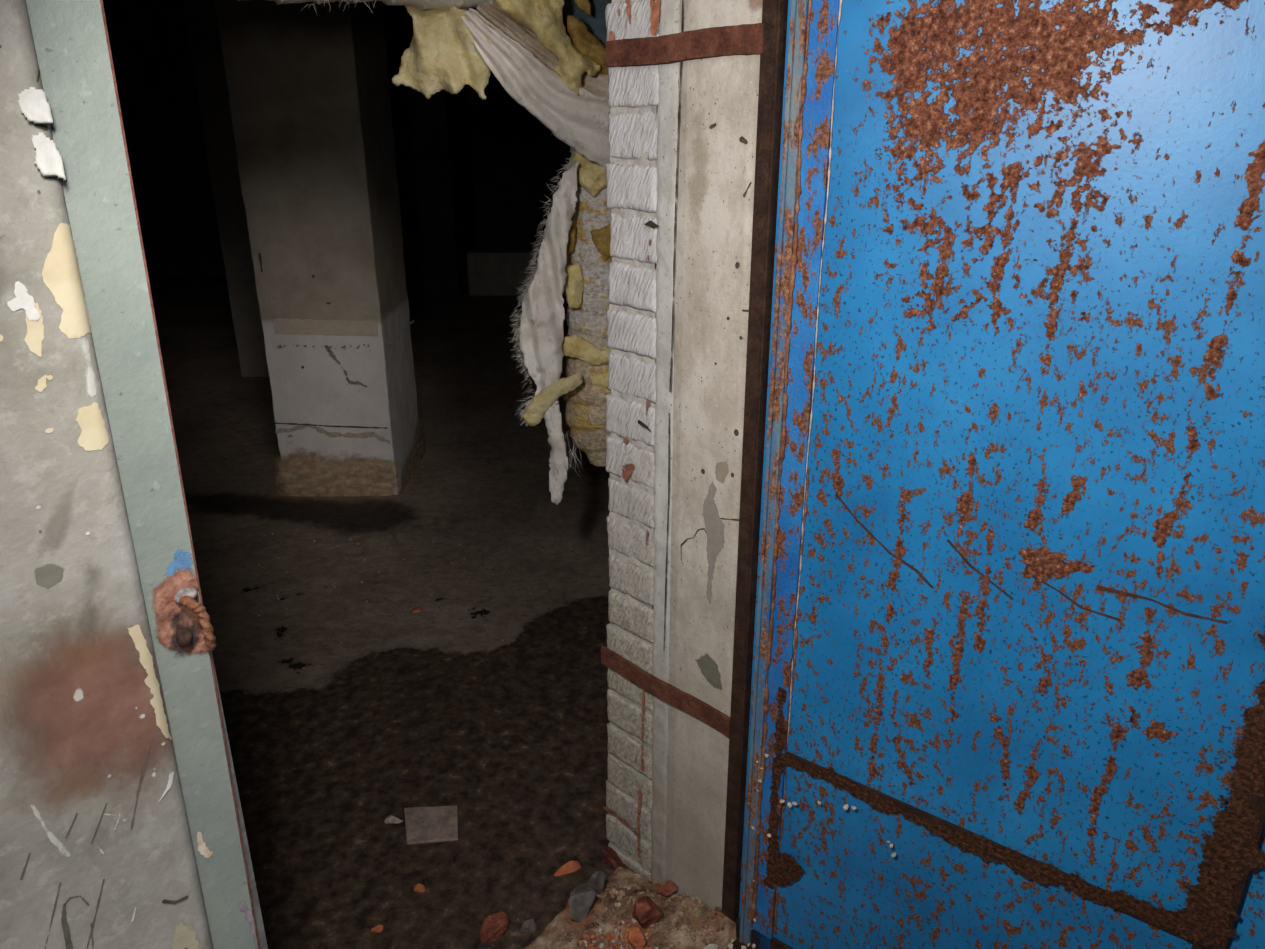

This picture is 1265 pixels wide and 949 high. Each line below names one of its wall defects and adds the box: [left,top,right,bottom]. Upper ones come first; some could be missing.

peeling [18,87,67,181]
peeling [7,281,44,357]
peeling [35,375,53,392]
peeling [42,223,109,451]
crack [274,421,387,429]
crack [325,345,367,387]
corrosion [751,0,1265,948]
corrosion [153,569,208,655]
corrosion [0,633,169,791]
peeling [128,625,172,746]